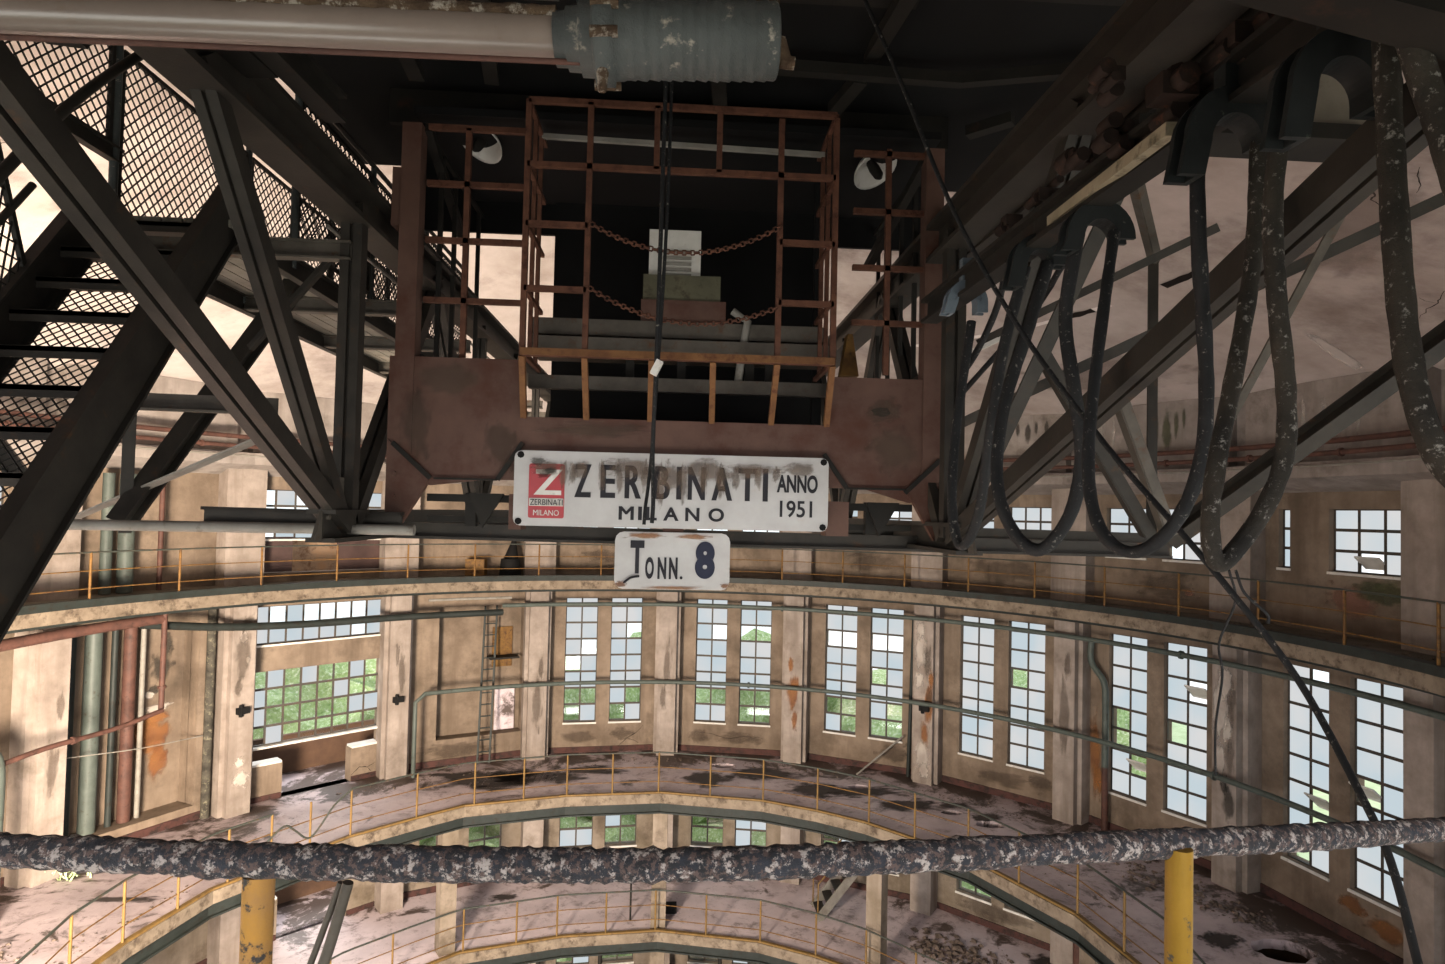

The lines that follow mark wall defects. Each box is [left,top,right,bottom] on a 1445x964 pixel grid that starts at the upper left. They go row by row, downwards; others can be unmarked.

rust [787,657,798,729]
rust [134,713,168,776]